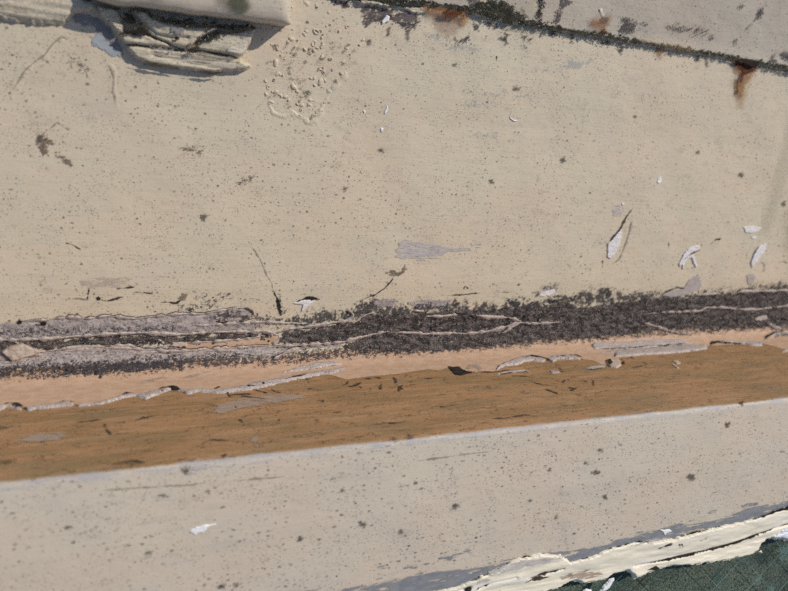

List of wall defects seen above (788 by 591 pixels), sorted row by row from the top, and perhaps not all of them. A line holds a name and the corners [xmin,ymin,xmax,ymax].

peeling [71,13,124,57]
rust [735,59,759,96]
peeling [606,203,633,263]
peeling [533,283,560,297]
peeling [663,245,721,297]
peeling [732,226,788,294]
peeling [0,296,788,411]
peeling [190,524,215,535]
peeling [542,501,788,562]
peeling [343,549,523,591]